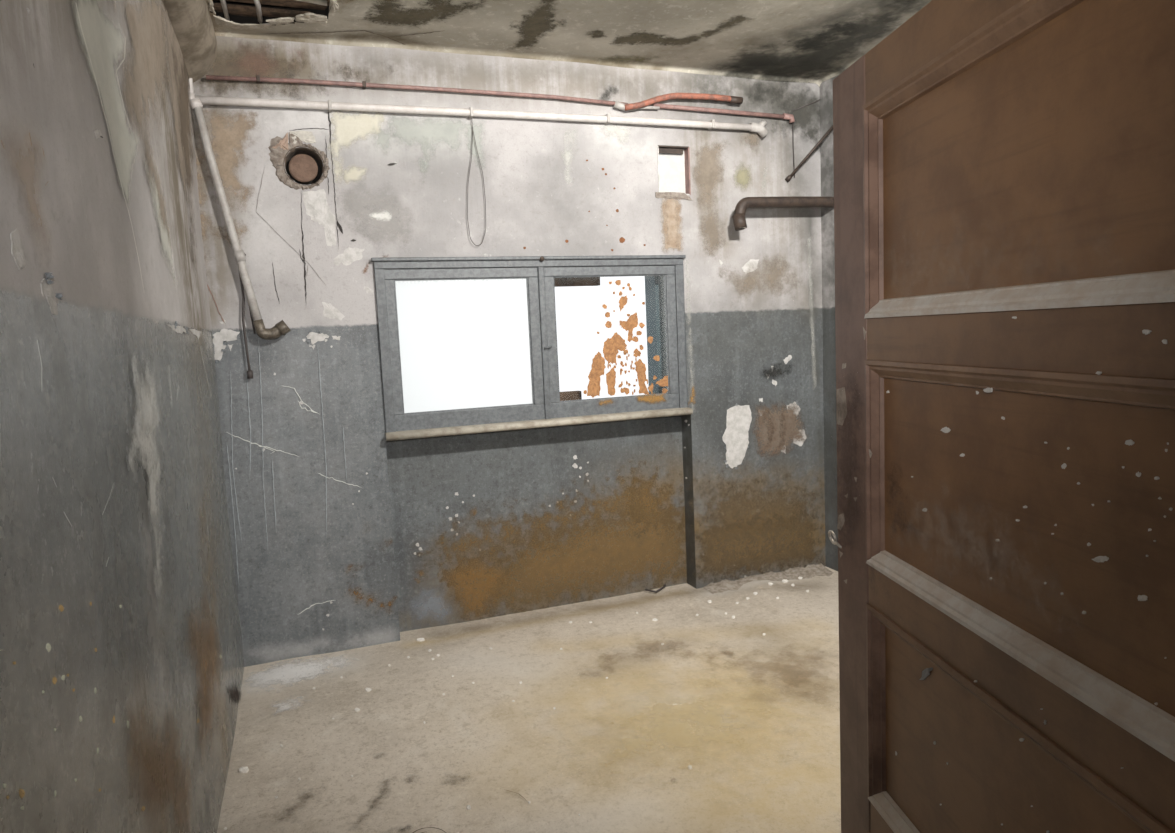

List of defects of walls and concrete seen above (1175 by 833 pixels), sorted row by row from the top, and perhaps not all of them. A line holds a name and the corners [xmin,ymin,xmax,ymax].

leakage [364,0,483,26]
leakage [512,0,563,47]
leakage [588,15,747,62]
spalling [268,131,364,266]
leakage [694,145,722,254]
peeling [722,398,763,469]
peeling [781,400,807,454]